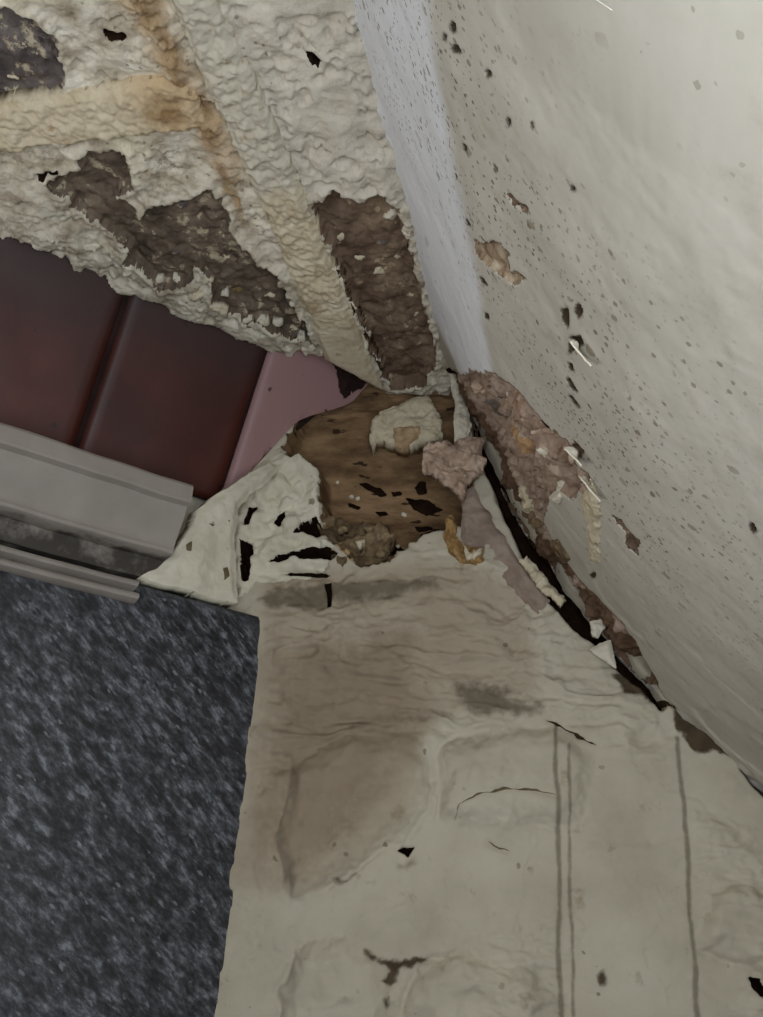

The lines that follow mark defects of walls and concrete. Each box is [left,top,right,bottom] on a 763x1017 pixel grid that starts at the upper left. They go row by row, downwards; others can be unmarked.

flaking render [0,7,65,92]
corrosion [138,0,215,146]
flaking render [47,150,317,353]
flaking render [311,190,662,692]
spalling [223,452,337,598]
water stain [614,674,652,702]
water stain [671,704,728,755]
water stain [365,950,426,985]